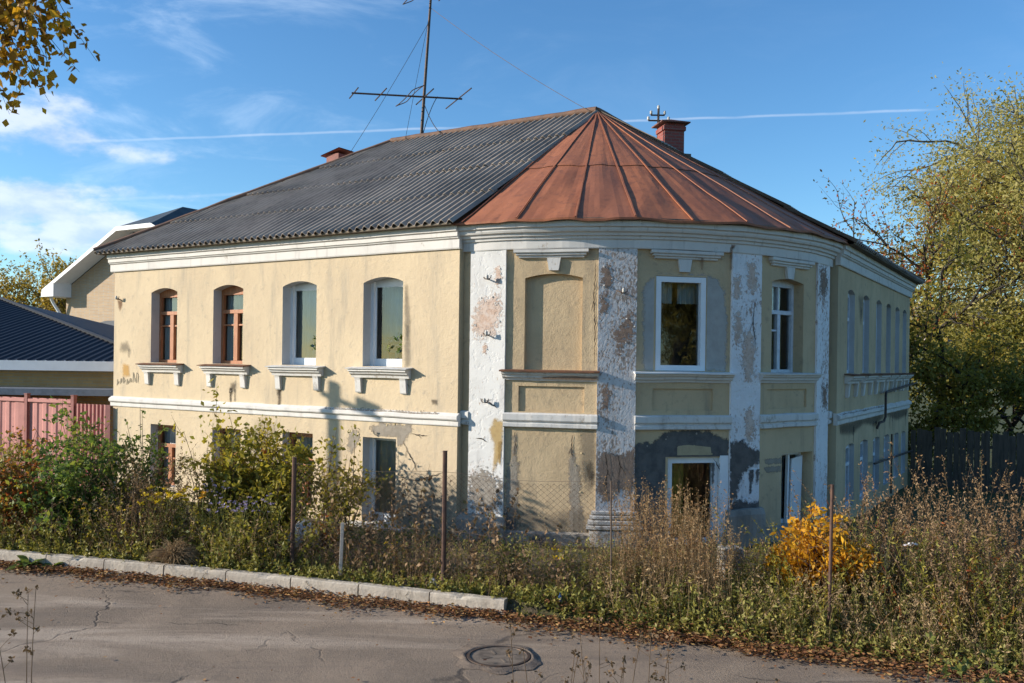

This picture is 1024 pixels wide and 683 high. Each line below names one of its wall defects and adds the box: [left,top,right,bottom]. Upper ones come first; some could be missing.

peeling [471,266,504,354]
peeling [599,264,636,358]
peeling [732,258,759,383]
flaking render [325,406,437,454]
peeling [601,382,613,410]
flaking render [596,445,648,502]
flaking render [730,406,760,510]